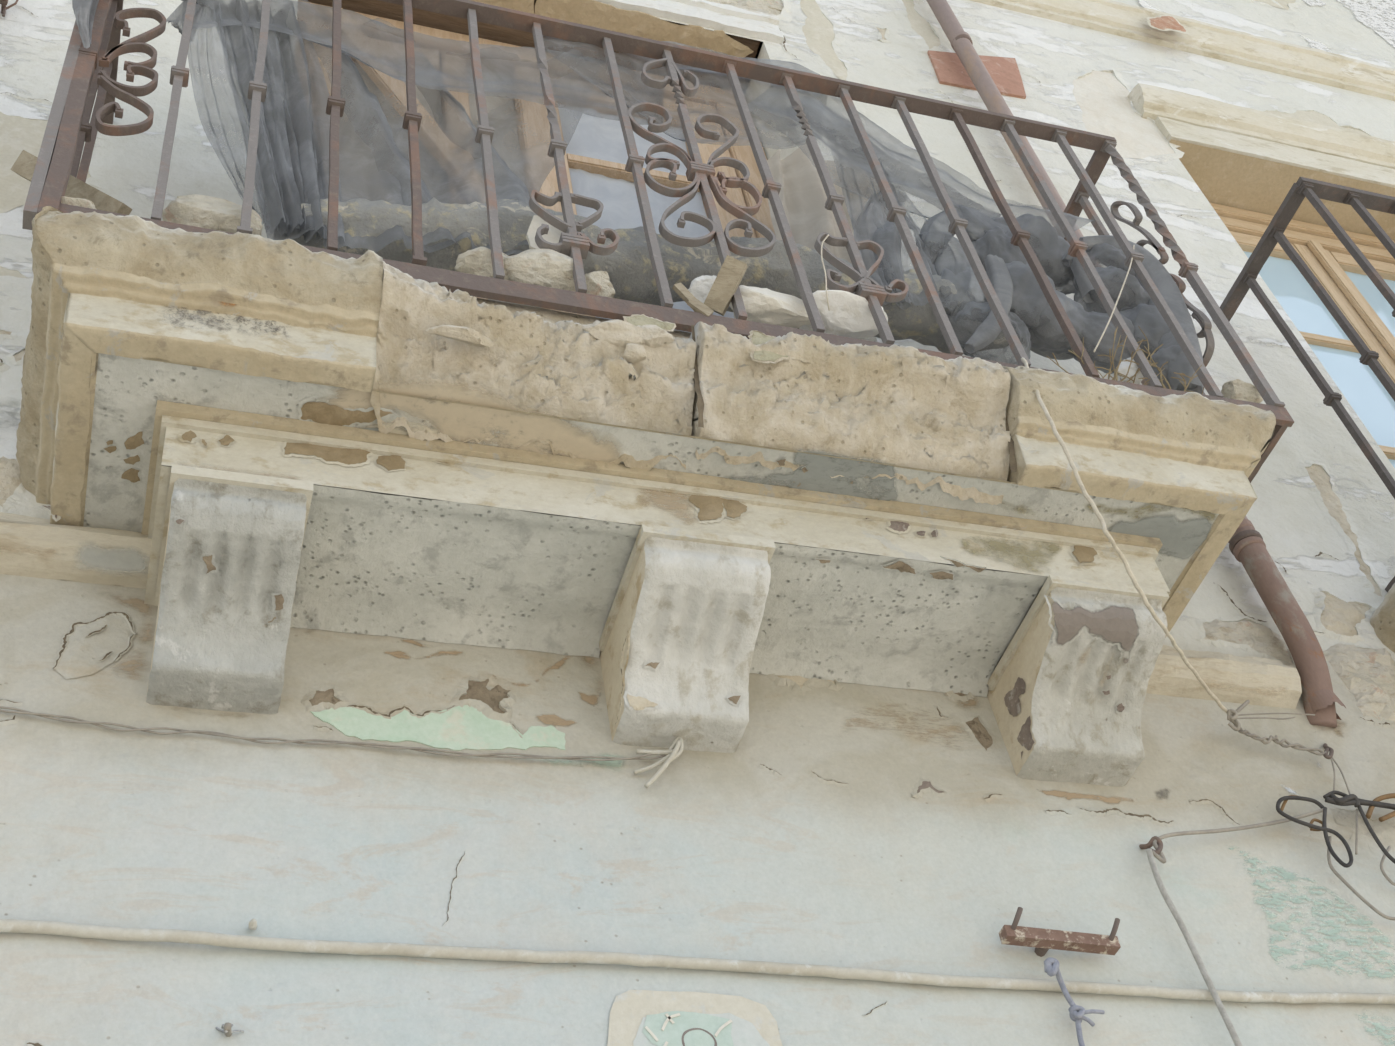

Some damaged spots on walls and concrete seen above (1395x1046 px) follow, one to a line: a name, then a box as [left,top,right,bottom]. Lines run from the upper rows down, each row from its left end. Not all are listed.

spalling [471,0,754,57]
peeling [706,0,861,83]
peeling [1243,0,1395,48]
peeling [0,85,50,227]
peeling [76,118,109,189]
crack [691,325,704,428]
spalling [102,429,148,483]
spalling [1296,459,1395,727]
spalling [1044,595,1142,714]
peeling [301,674,568,763]
spalling [1004,675,1036,760]
crack [442,851,466,926]